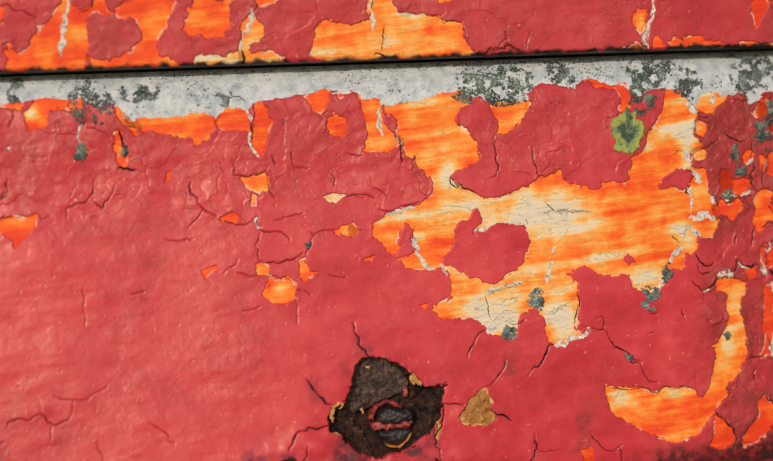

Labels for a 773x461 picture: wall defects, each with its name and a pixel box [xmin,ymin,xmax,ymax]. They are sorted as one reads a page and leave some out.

peeling [4,0,177,72]
peeling [182,0,285,65]
peeling [309,0,474,61]
crack [77,122,138,171]
peeling [113,101,274,168]
crack [212,94,308,198]
crack [376,105,403,162]
crack [332,174,418,216]
peeling [358,89,773,346]
crack [168,182,332,321]
crack [411,236,448,276]
peeling [605,246,773,449]